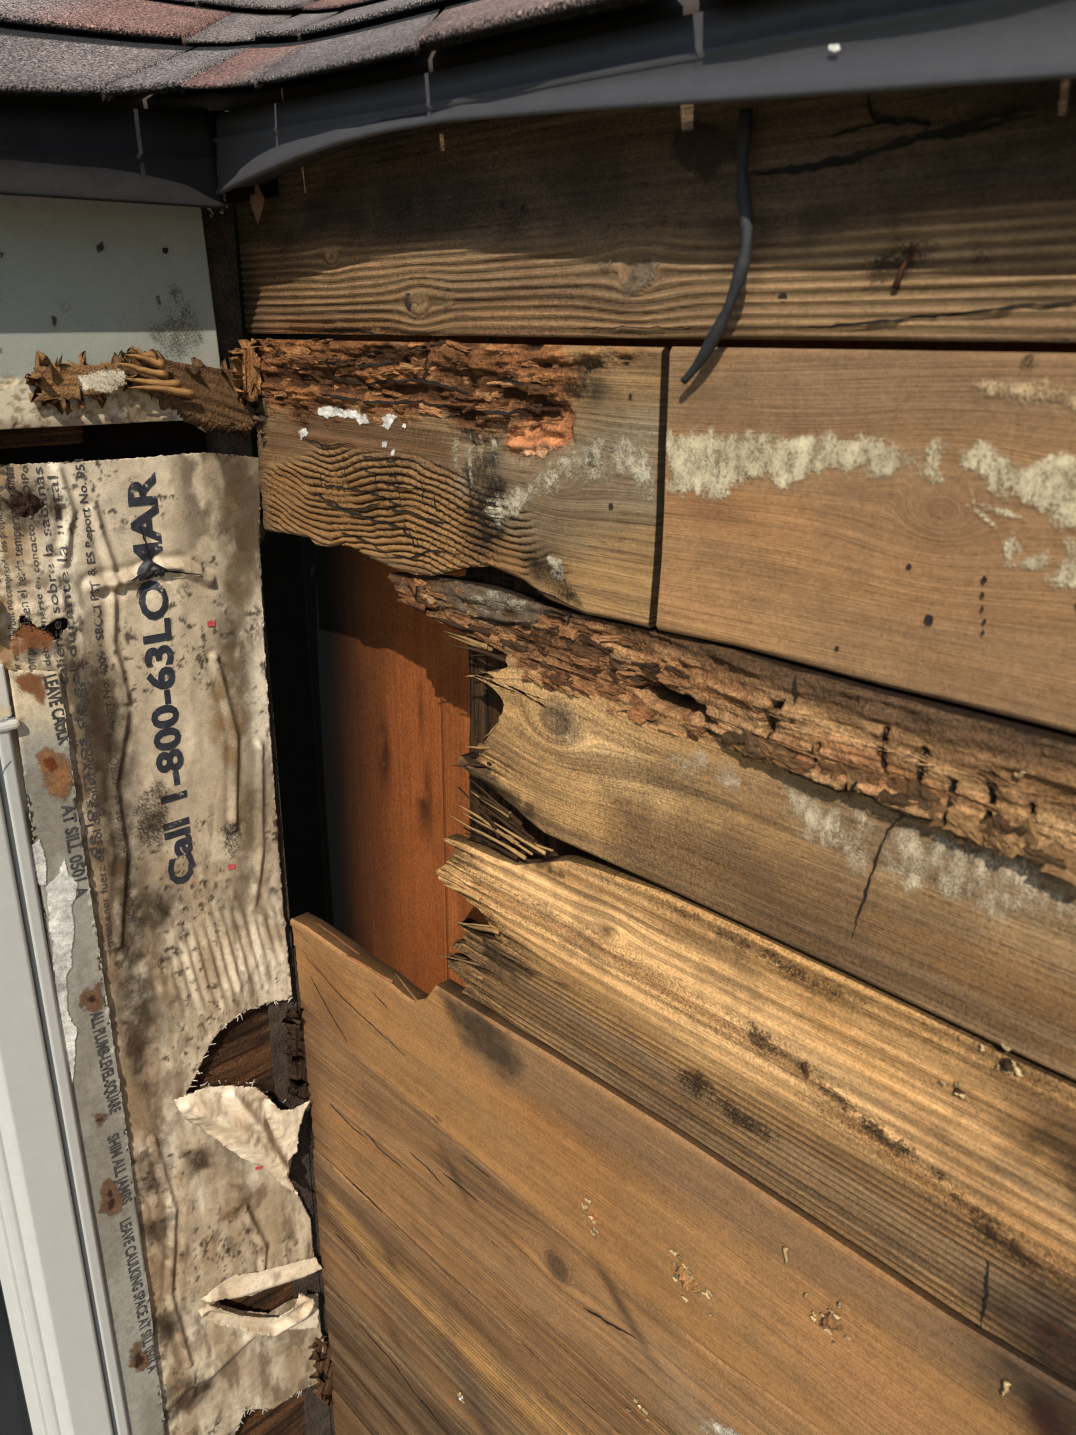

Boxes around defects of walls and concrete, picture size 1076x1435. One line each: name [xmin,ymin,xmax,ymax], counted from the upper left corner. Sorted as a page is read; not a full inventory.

crack [755,92,1038,176]
peeling [78,369,126,392]
damp [151,287,202,356]
peeling [260,338,563,458]
damp [214,487,252,770]
peeling [414,578,1076,887]
crack [791,674,799,705]
damp [92,681,170,926]
damp [220,799,252,859]
crack [787,727,995,937]
damp [115,932,168,1057]